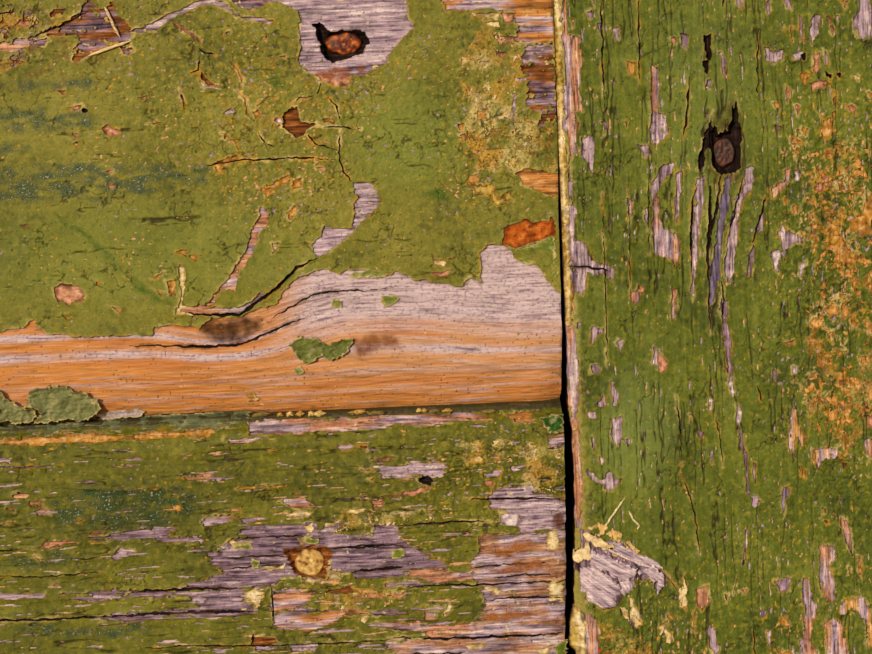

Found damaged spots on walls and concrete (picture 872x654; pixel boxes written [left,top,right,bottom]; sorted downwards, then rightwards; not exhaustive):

peeling [131,0,413,87]
peeling [441,0,558,206]
peeling [0,207,562,446]
peeling [311,182,380,258]
crack [570,204,608,356]
peeling [576,322,604,344]
peeling [630,284,644,303]
crack [627,186,650,282]
crack [690,176,744,328]
crack [752,198,765,242]
peeling [587,380,630,447]
crack [676,397,700,553]